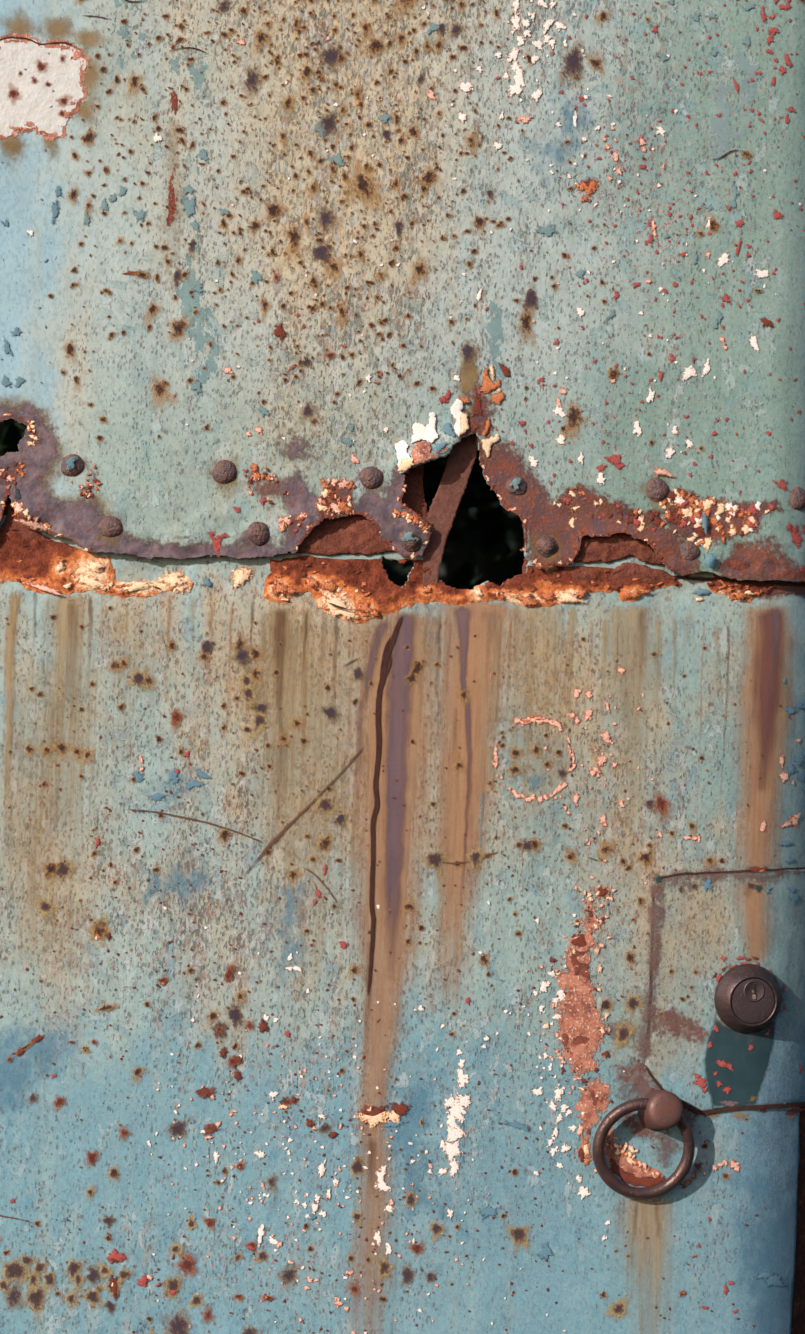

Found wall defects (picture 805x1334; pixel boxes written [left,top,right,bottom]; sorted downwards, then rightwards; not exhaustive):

peeling [0,0,148,150]
peeling [458,66,484,94]
rust [547,43,601,88]
rust [68,0,524,398]
rust [556,154,602,202]
rust [513,275,557,340]
peeling [427,1049,471,1180]
peeling [374,1165,394,1213]
rust [0,1188,215,1334]